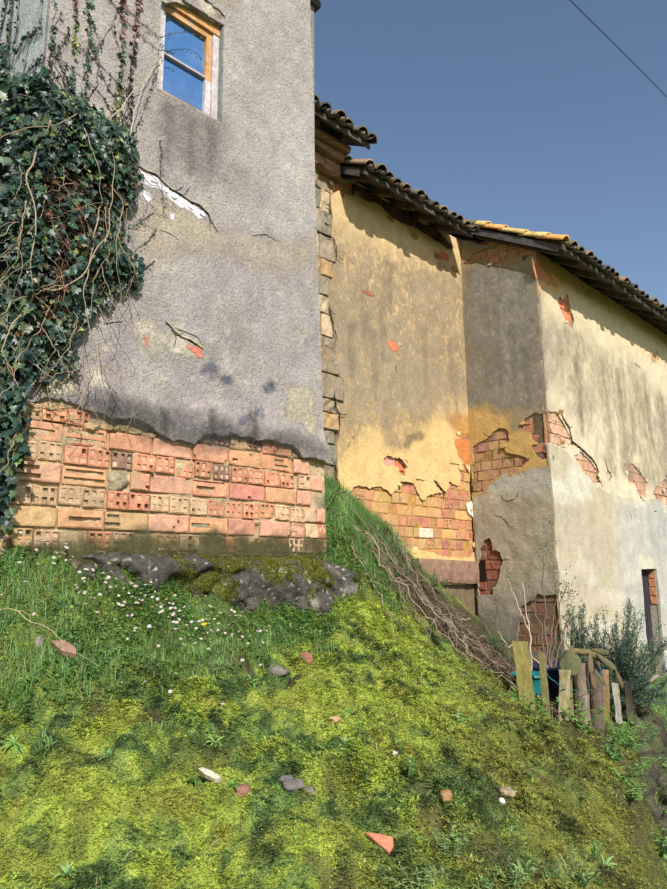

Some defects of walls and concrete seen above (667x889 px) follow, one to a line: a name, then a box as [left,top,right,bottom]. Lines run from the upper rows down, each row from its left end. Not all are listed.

crack [139,165,219,232]
damp [202,363,231,383]
spalling [0,162,573,569]
spalling [351,407,602,595]
crack [562,414,612,487]
spalling [623,463,667,504]
spalling [518,592,570,652]